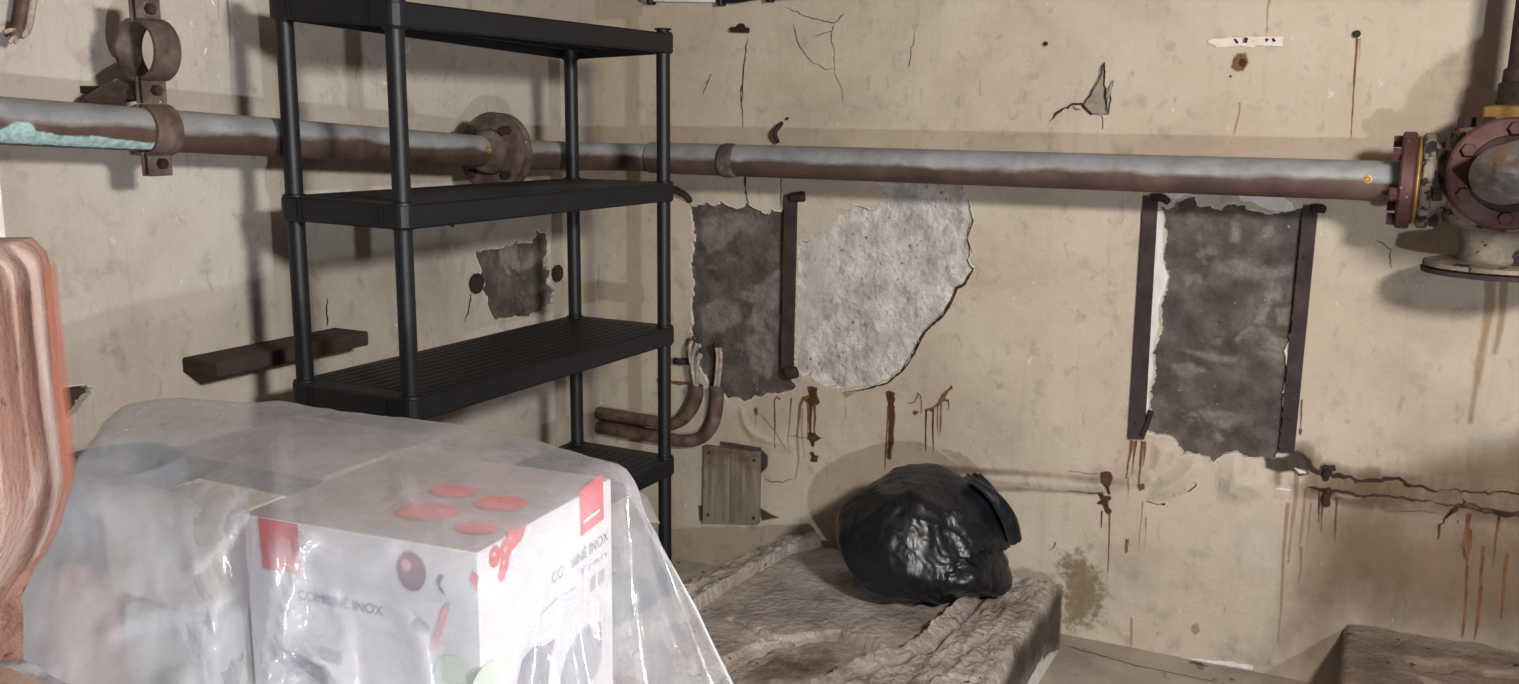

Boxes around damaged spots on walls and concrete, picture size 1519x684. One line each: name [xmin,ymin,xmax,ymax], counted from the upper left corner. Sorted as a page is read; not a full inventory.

flaking render [1050,62,1114,130]
corrosion [1229,53,1248,78]
spalling [474,229,556,322]
spalling [688,182,975,403]
spalling [1146,193,1303,464]
corrosion [754,386,821,462]
corrosion [885,385,953,464]
corrosion [1097,440,1146,569]
crack [1300,453,1519,525]
corrosion [1462,513,1509,639]